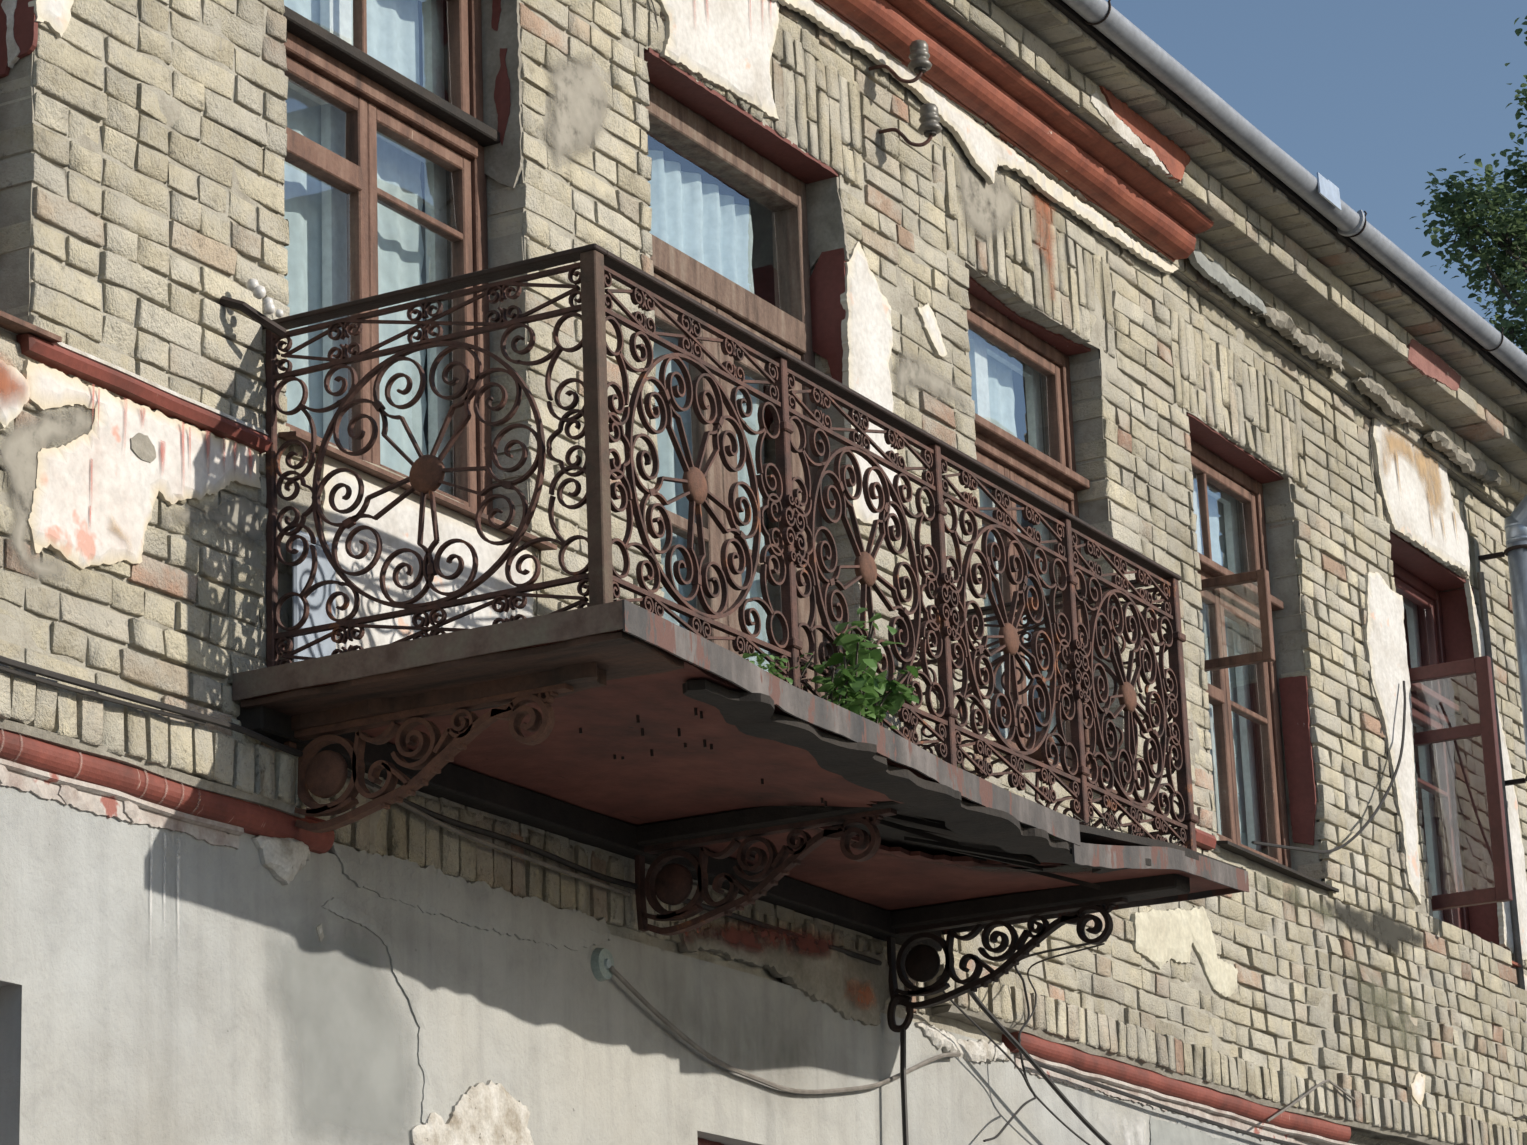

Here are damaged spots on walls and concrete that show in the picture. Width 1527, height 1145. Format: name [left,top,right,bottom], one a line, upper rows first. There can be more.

peeling [0,0,74,78]
peeling [657,0,1179,274]
peeling [810,241,894,412]
peeling [0,360,261,570]
peeling [843,407,901,532]
peeling [1255,306,1502,658]
peeling [1361,572,1421,905]
peeling [1497,704,1527,1023]
flaking render [409,1080,534,1145]